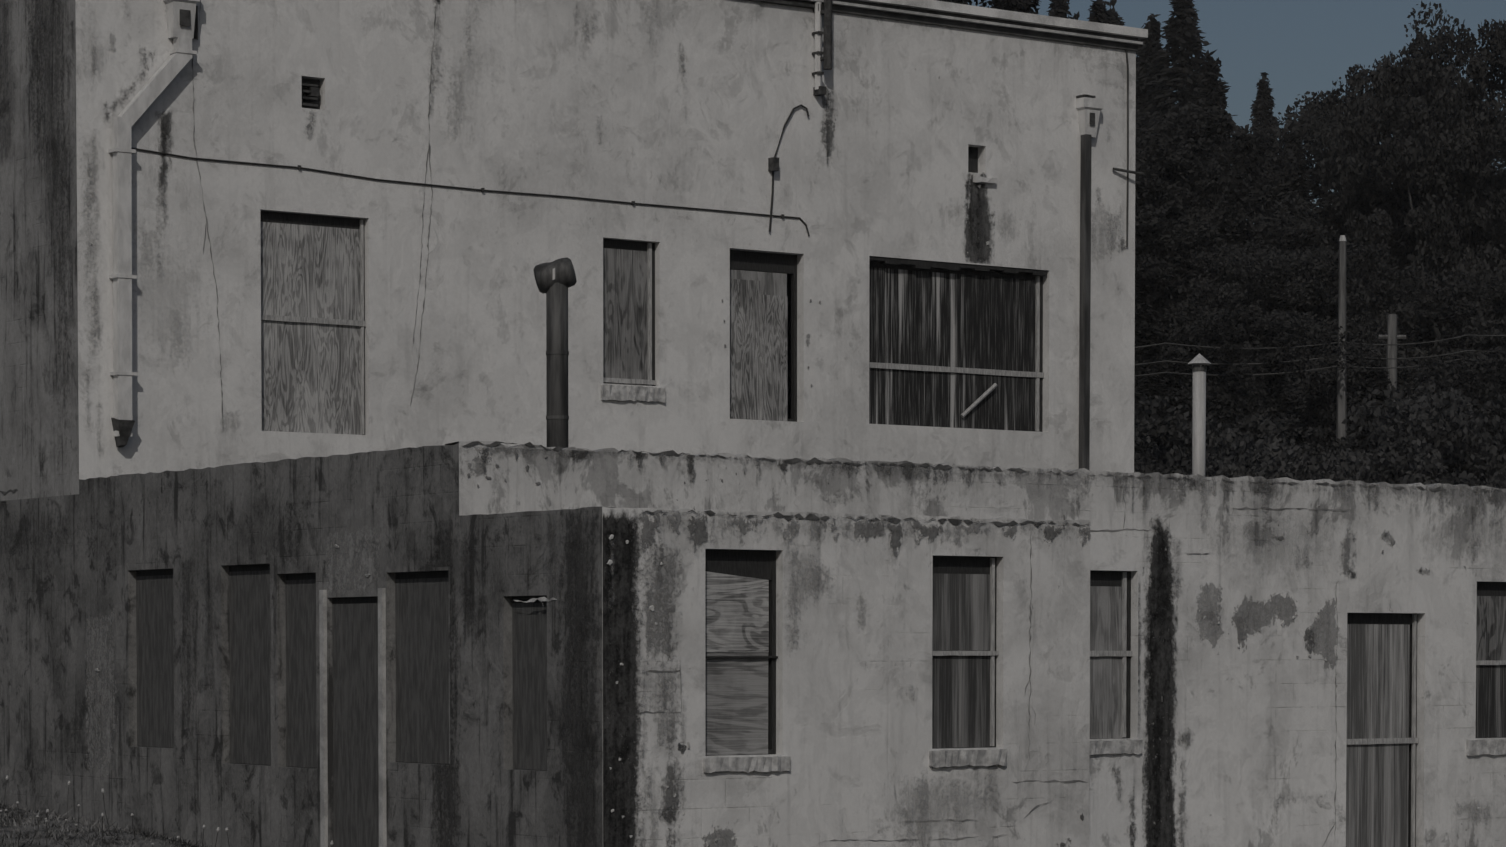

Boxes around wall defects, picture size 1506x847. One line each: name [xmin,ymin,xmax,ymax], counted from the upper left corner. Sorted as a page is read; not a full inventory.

water stain [548,511,685,847]
water stain [1112,477,1190,847]
peeling [1195,583,1340,687]